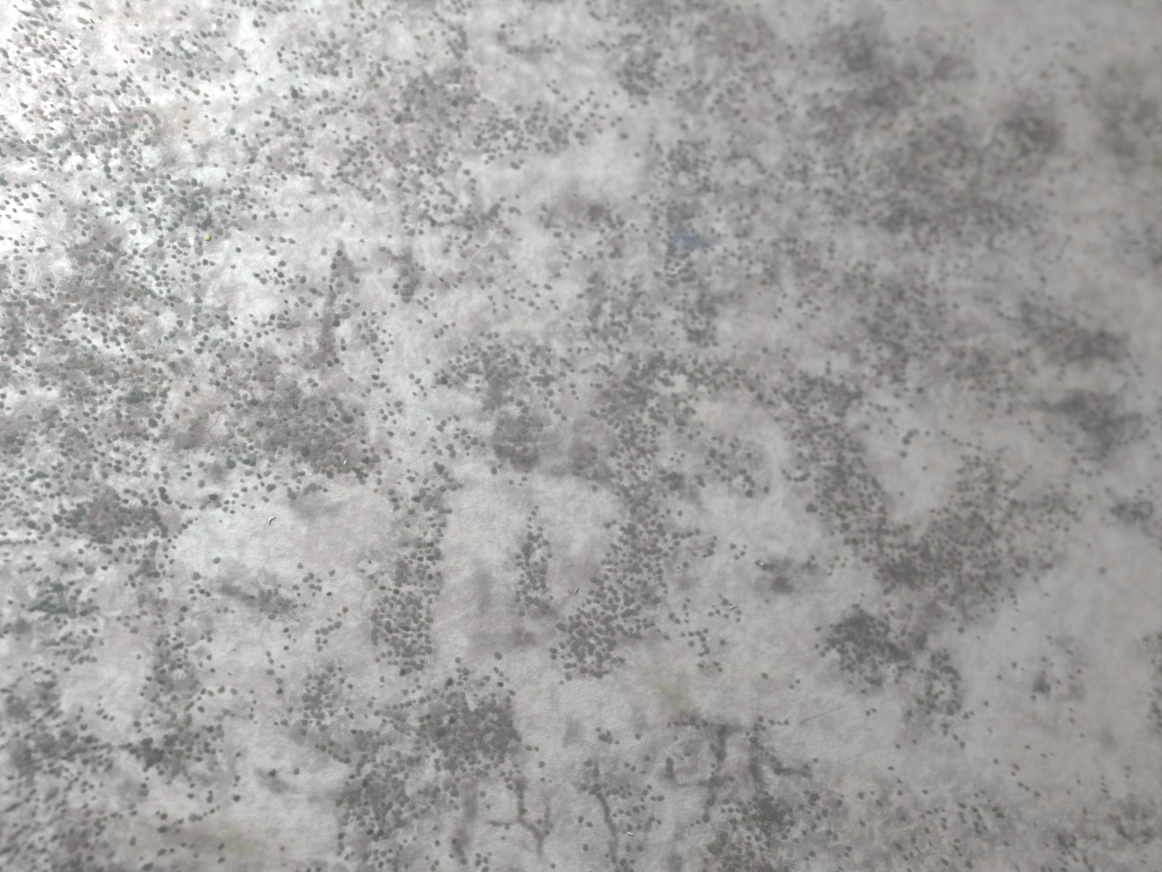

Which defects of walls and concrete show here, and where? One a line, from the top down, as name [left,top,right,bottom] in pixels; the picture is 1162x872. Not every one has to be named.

water stain [426,0,1070,728]
water stain [0,0,583,872]
water stain [746,716,781,775]
water stain [582,784,645,829]
water stain [691,745,851,872]
water stain [897,808,946,872]
water stain [962,791,1004,833]